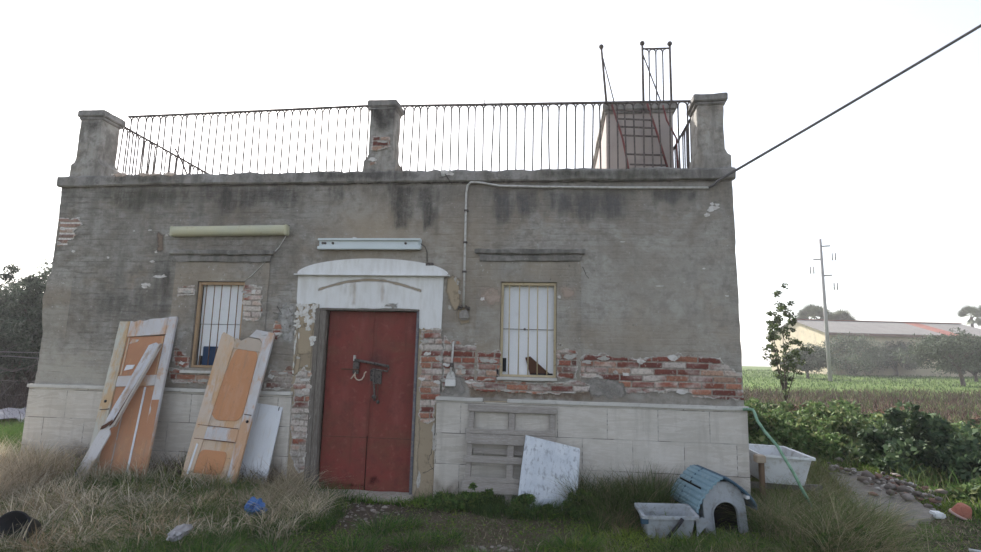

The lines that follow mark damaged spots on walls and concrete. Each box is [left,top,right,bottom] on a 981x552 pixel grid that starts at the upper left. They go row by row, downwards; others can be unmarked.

spalling [368,136,391,165]
spalling [56,217,83,253]
spalling [242,285,263,322]
spalling [263,303,318,473]
spalling [415,328,745,498]